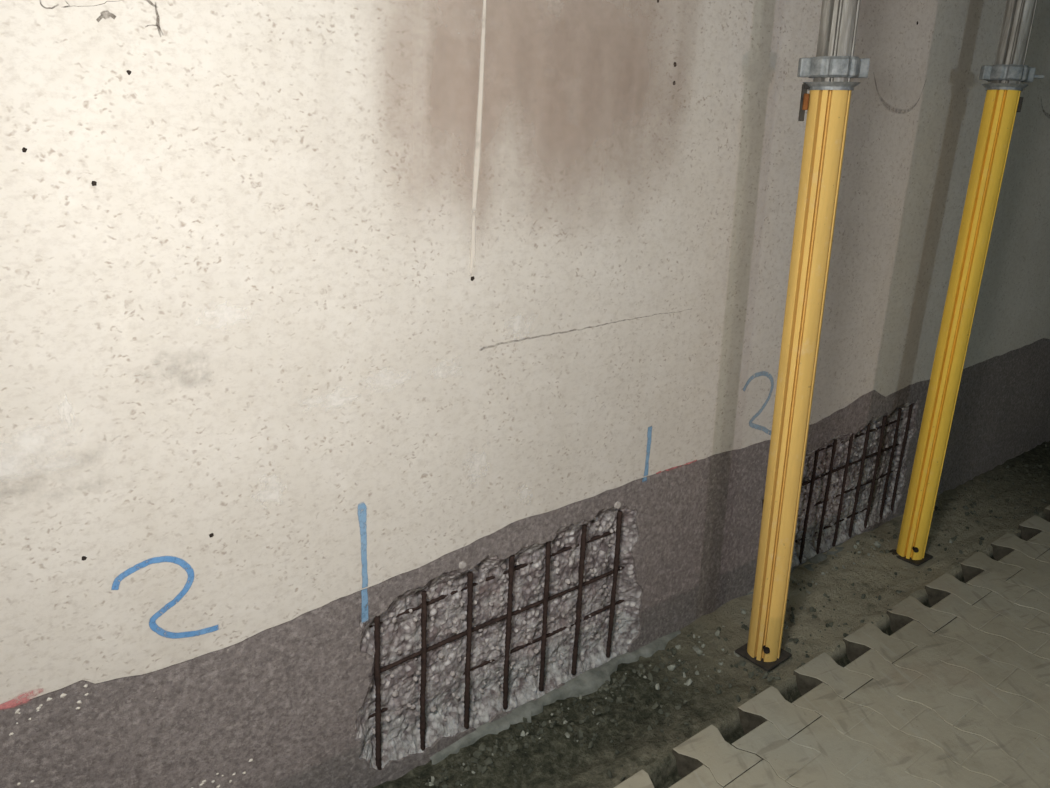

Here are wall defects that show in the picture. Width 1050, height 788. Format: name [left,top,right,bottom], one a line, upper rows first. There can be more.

crack [147,1,161,31]
water stain [431,0,649,274]
spalling [791,379,930,569]
peeling [937,338,1050,495]
peeling [0,440,770,788]